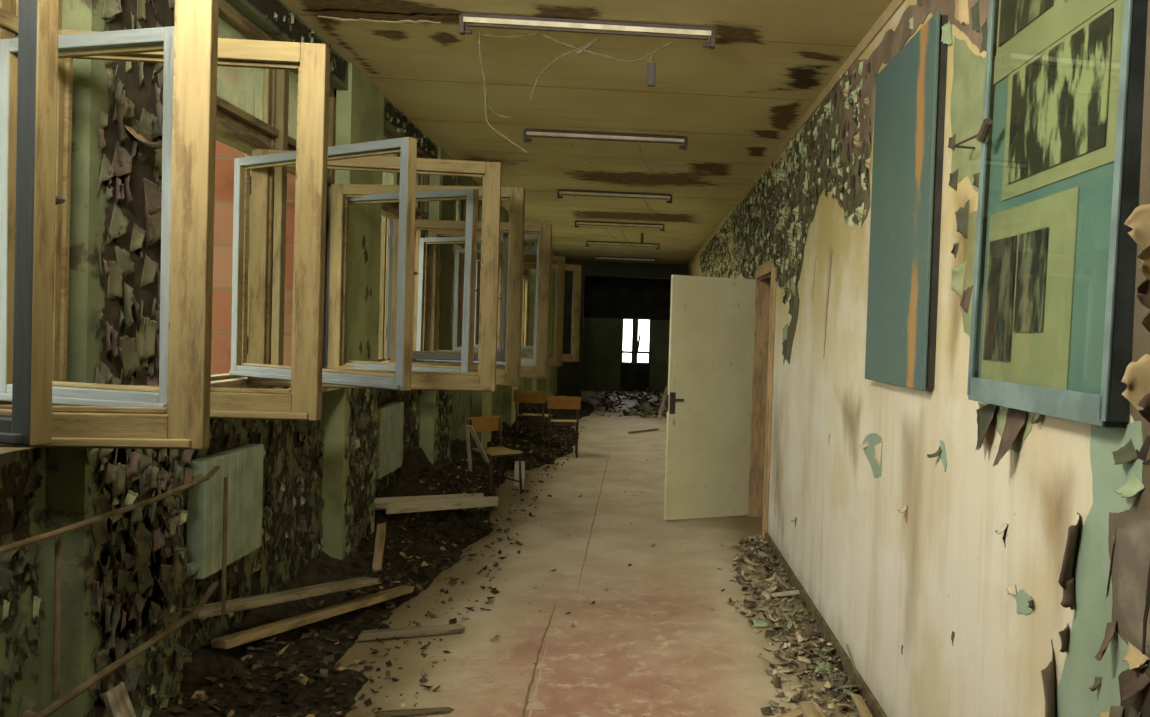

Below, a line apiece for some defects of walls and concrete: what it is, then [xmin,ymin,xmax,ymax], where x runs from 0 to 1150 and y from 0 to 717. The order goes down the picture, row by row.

peeling [102,0,175,31]
water stain [302,0,462,74]
water stain [534,5,601,20]
water stain [714,25,764,44]
water stain [745,52,840,156]
water stain [569,163,732,188]
peeling [95,60,164,386]
water stain [572,211,703,224]
peeling [1041,0,1150,717]
peeling [976,402,1045,466]
peeling [0,448,45,717]
peeling [84,404,325,717]